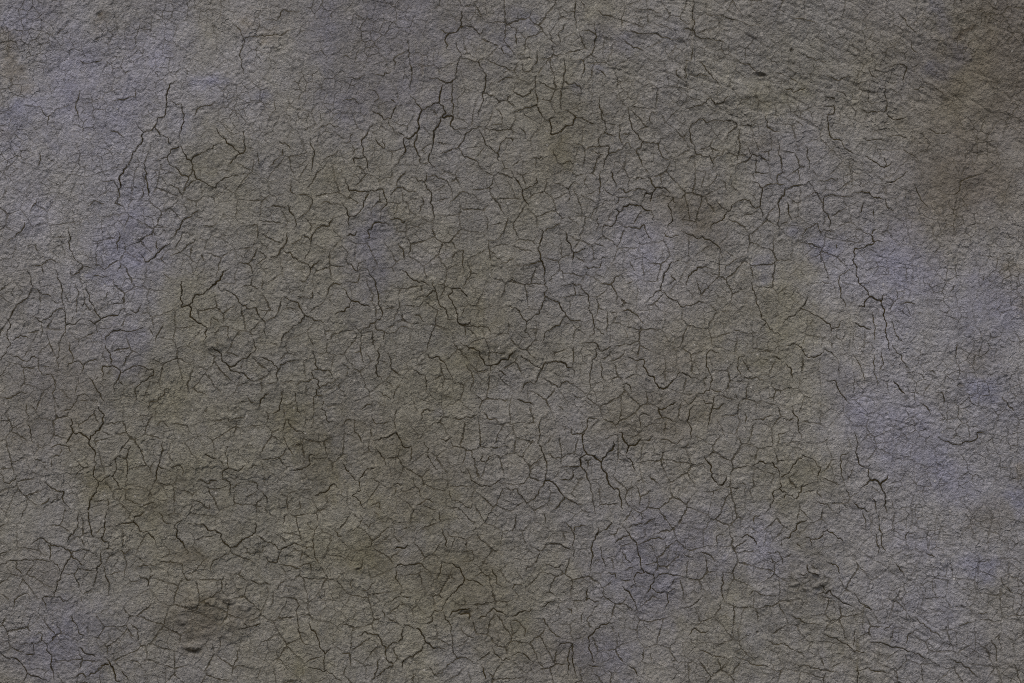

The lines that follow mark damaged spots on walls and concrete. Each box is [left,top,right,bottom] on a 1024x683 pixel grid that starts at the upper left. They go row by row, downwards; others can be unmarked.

crack [0,203,351,682]
crack [88,81,291,210]
crack [142,0,944,682]
crack [793,612,987,683]